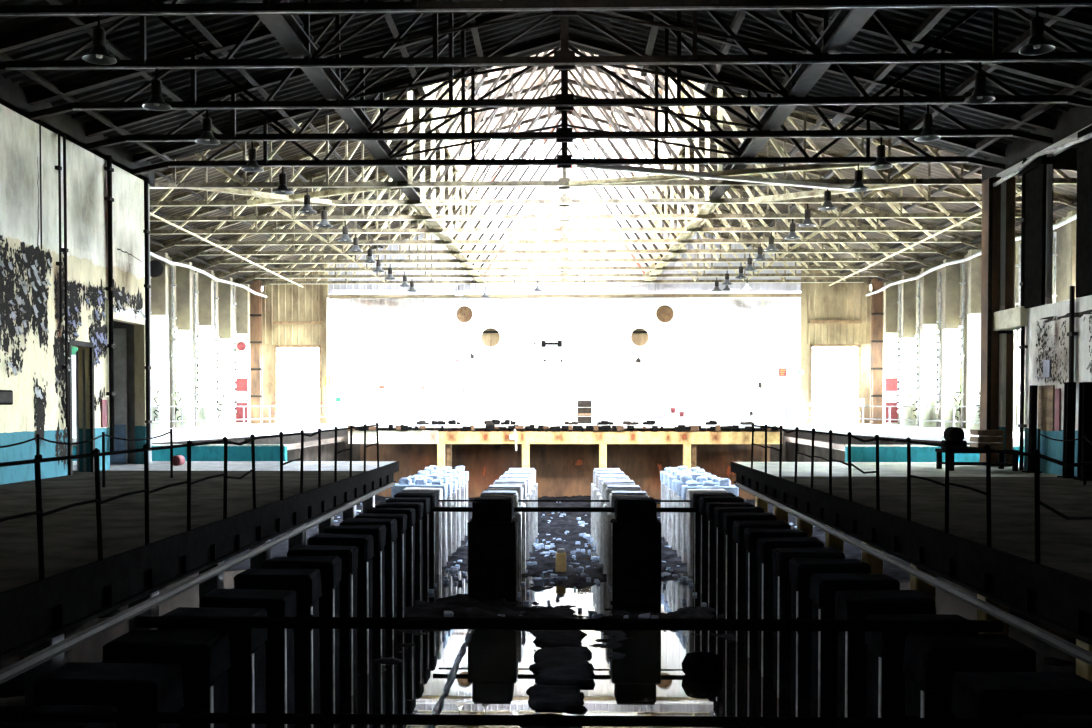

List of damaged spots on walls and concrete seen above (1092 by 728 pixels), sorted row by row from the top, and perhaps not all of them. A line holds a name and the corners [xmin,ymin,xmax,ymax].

peeling [0,234,146,471]
peeling [1035,309,1092,384]